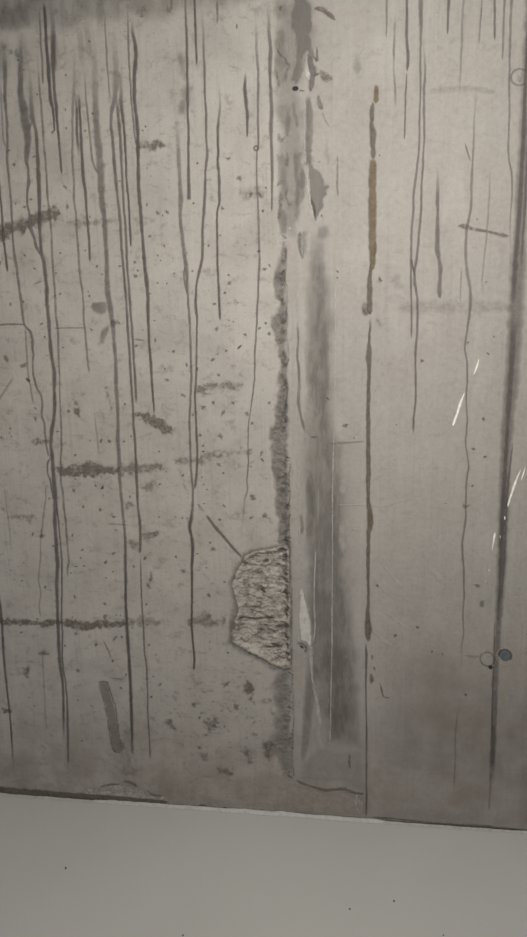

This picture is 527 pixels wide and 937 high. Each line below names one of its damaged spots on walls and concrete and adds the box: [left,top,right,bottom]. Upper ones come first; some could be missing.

damp [0,6,133,759]
damp [110,35,155,551]
damp [179,0,221,668]
damp [244,42,273,438]
spalling [227,545,292,669]
damp [299,552,332,740]
damp [309,162,329,220]
rust [365,325,373,640]
rust [367,86,378,314]
damp [410,115,425,334]
crack [459,224,508,237]
damp [484,40,527,763]